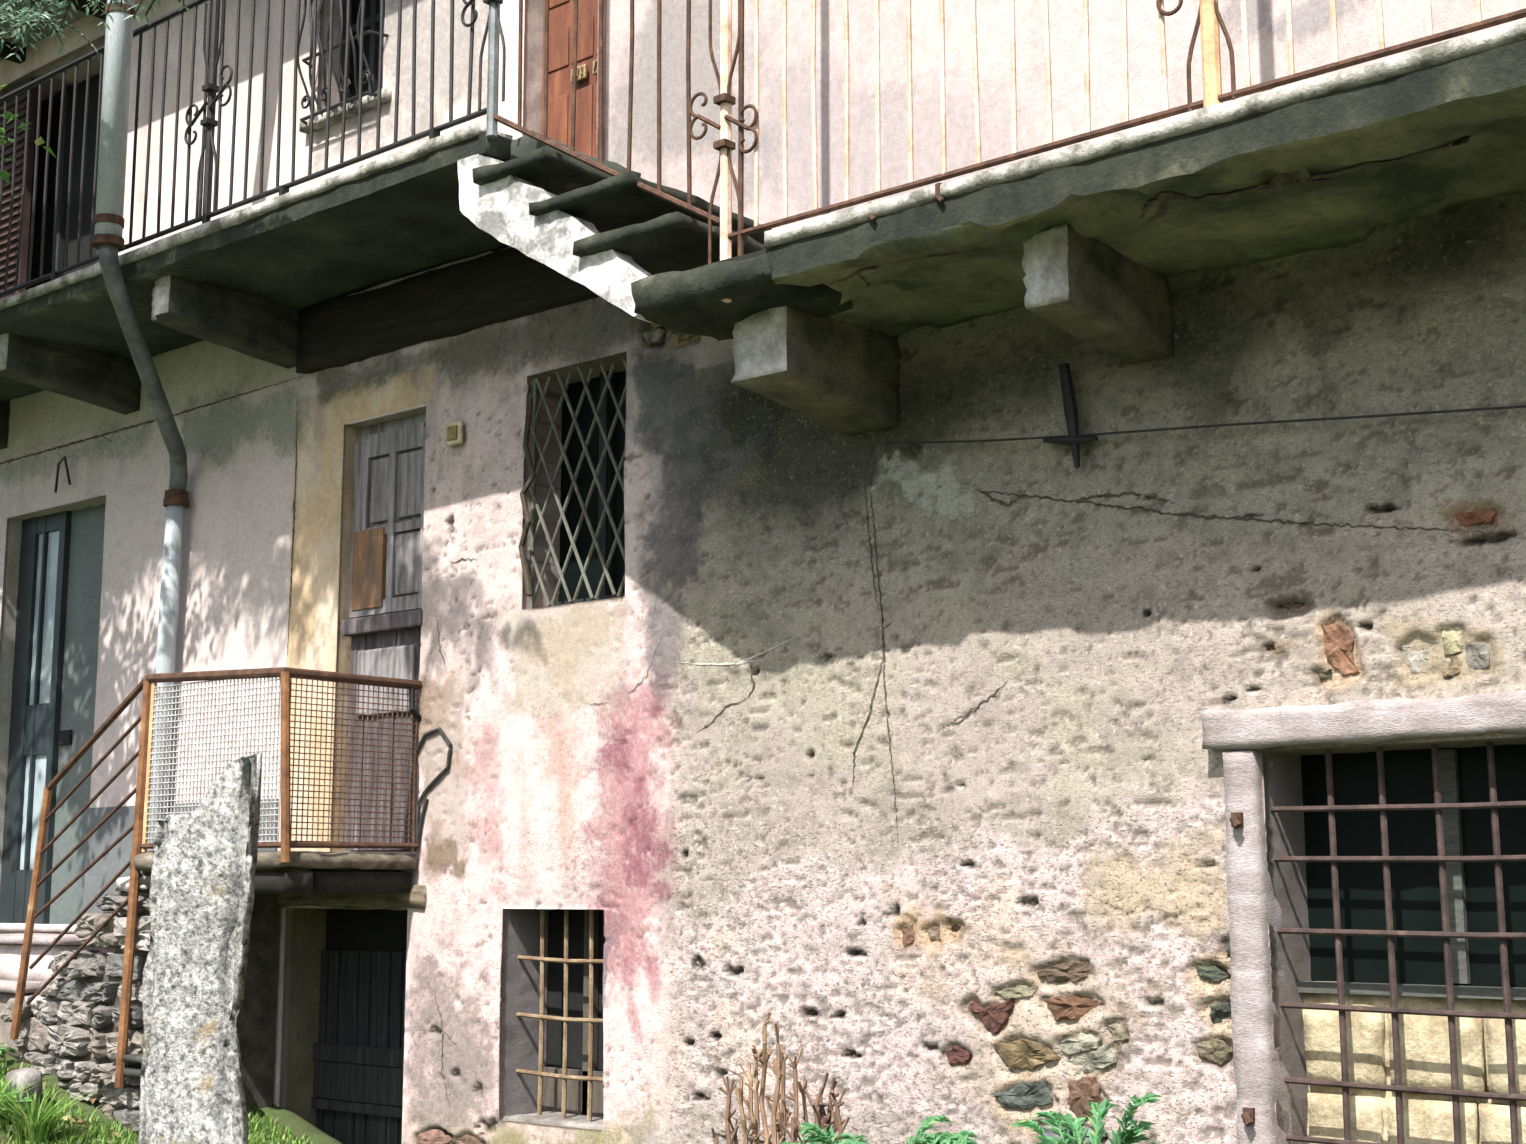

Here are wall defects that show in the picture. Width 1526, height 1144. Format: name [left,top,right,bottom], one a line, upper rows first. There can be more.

water stain [1334,199,1506,289]
water stain [1147,281,1300,378]
water stain [633,334,1122,694]
crack [940,486,1516,535]
crack [696,664,756,733]
crack [853,449,898,833]
spalling [1314,609,1363,689]
spalling [1384,618,1501,686]
peeling [406,956,492,1144]
spalling [945,952,1129,1144]